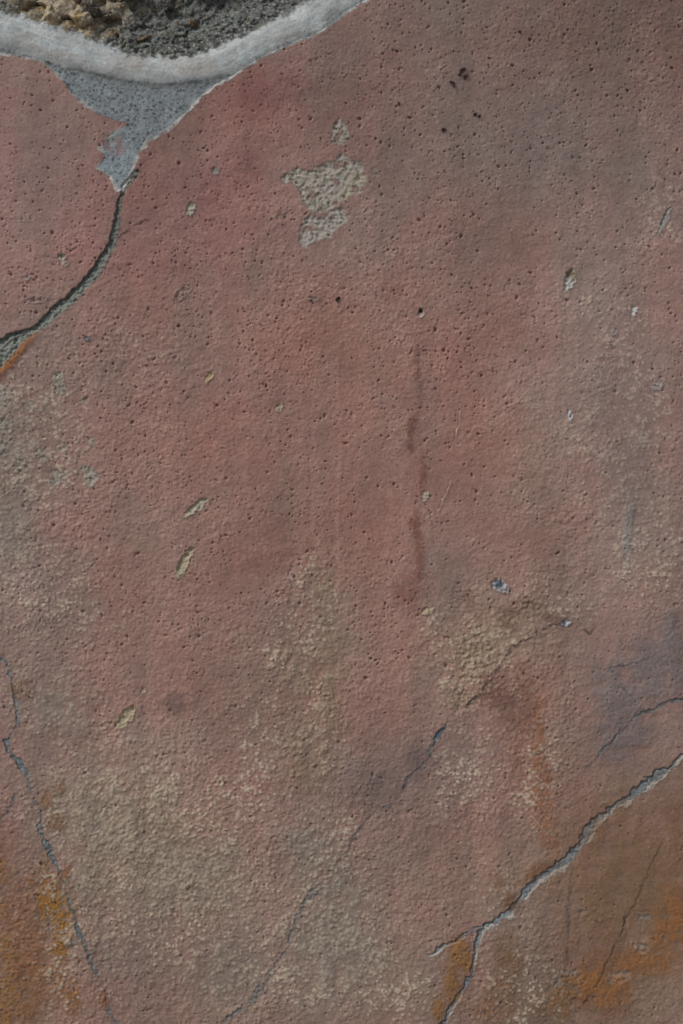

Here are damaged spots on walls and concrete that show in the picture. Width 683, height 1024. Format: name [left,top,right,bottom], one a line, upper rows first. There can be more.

crack [0,169,150,368]
spalling [0,0,368,192]
spalling [281,118,379,249]
crack [0,657,118,1024]
crack [428,754,683,1024]